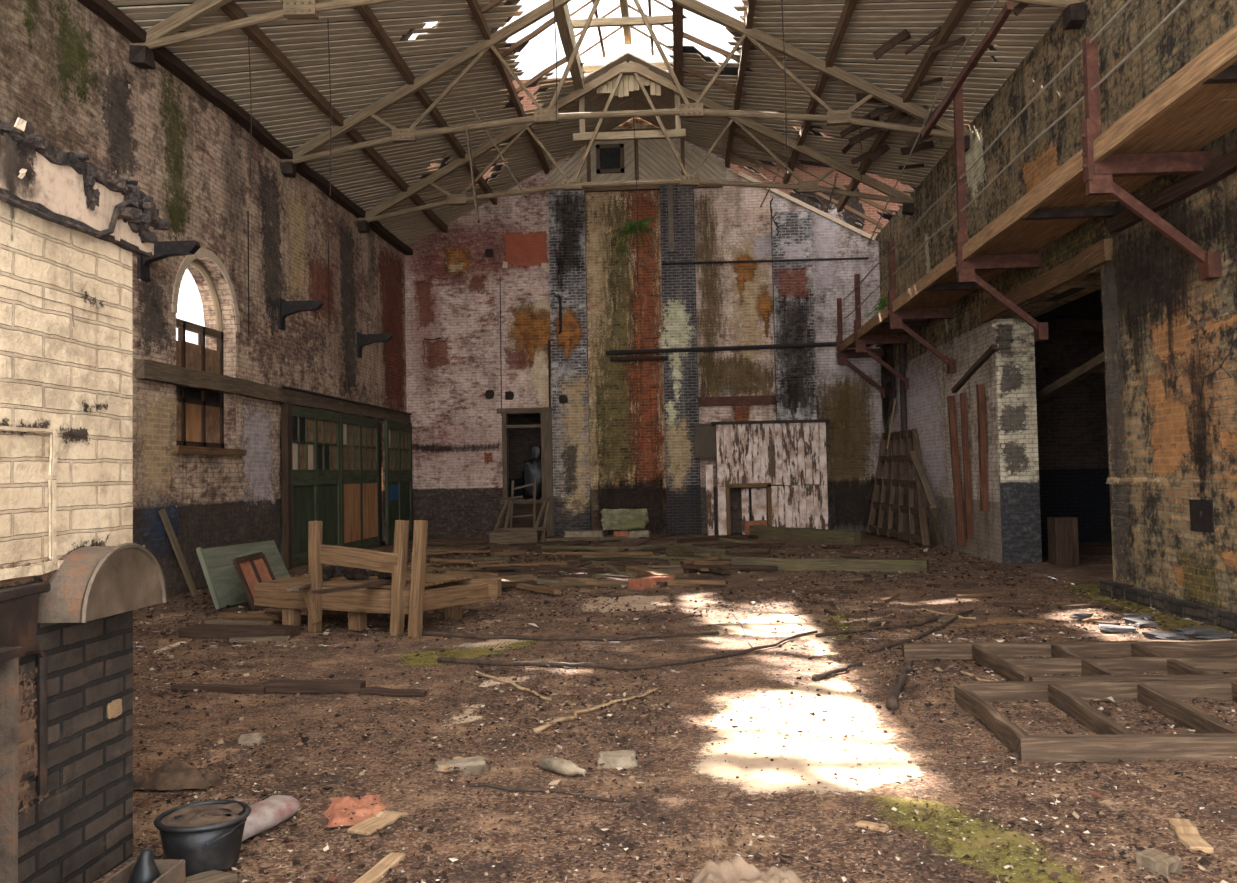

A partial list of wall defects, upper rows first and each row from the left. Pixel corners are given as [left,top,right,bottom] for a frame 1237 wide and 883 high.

damp [58,64,88,106]
spalling [449,263,487,294]
spalling [505,347,529,370]
damp [506,193,587,407]
peeling [556,191,624,512]
damp [596,299,712,534]
damp [730,246,819,420]
damp [1100,194,1237,582]
spalling [1143,306,1237,483]